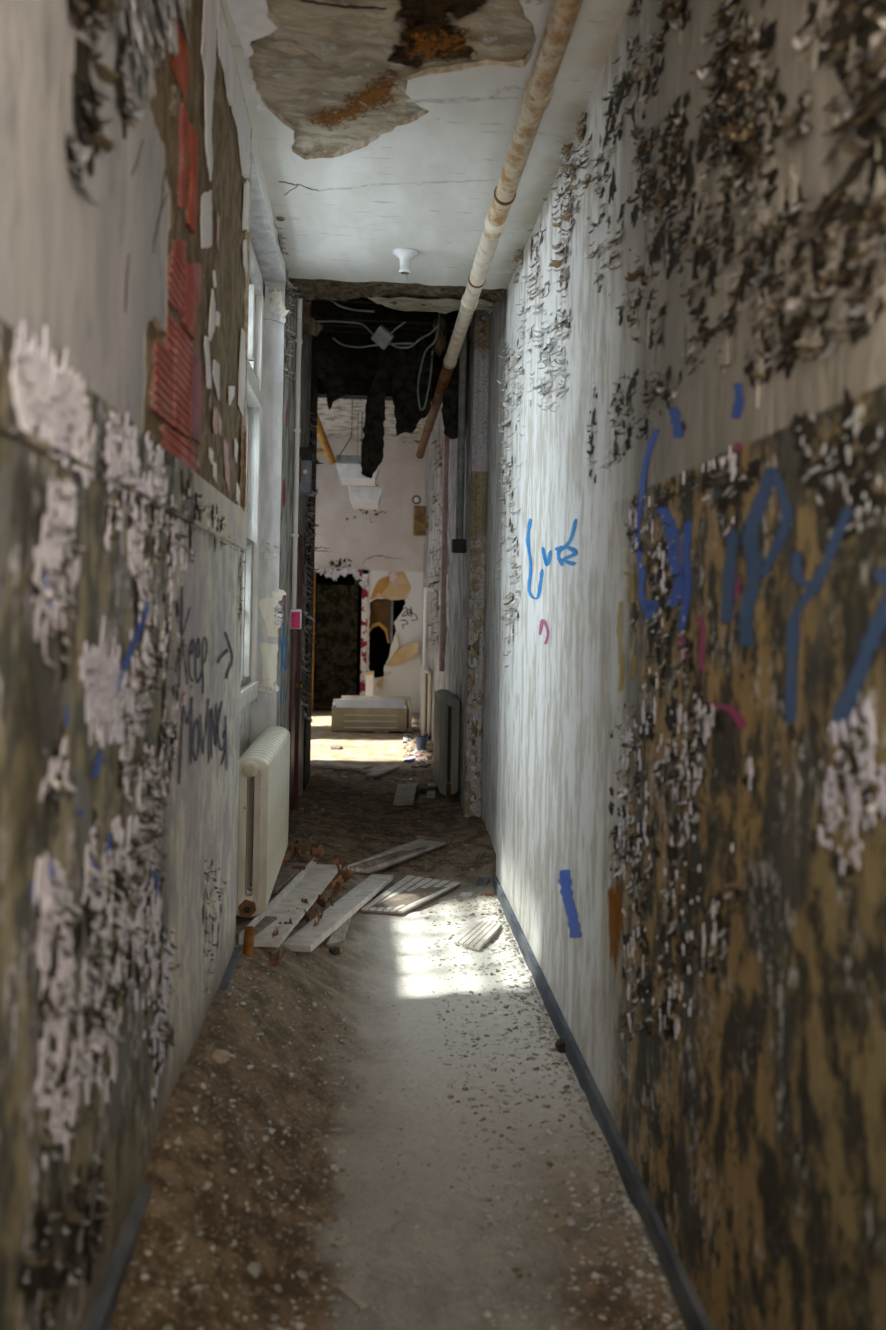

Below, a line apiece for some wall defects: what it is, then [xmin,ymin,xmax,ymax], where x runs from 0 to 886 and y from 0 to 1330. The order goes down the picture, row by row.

rust [305,67,400,131]
water stain [387,0,487,69]
rust [404,27,477,64]
peeling [264,0,886,814]
spalling [11,0,546,1330]
peeling [608,447,761,1042]
peeling [817,699,886,877]